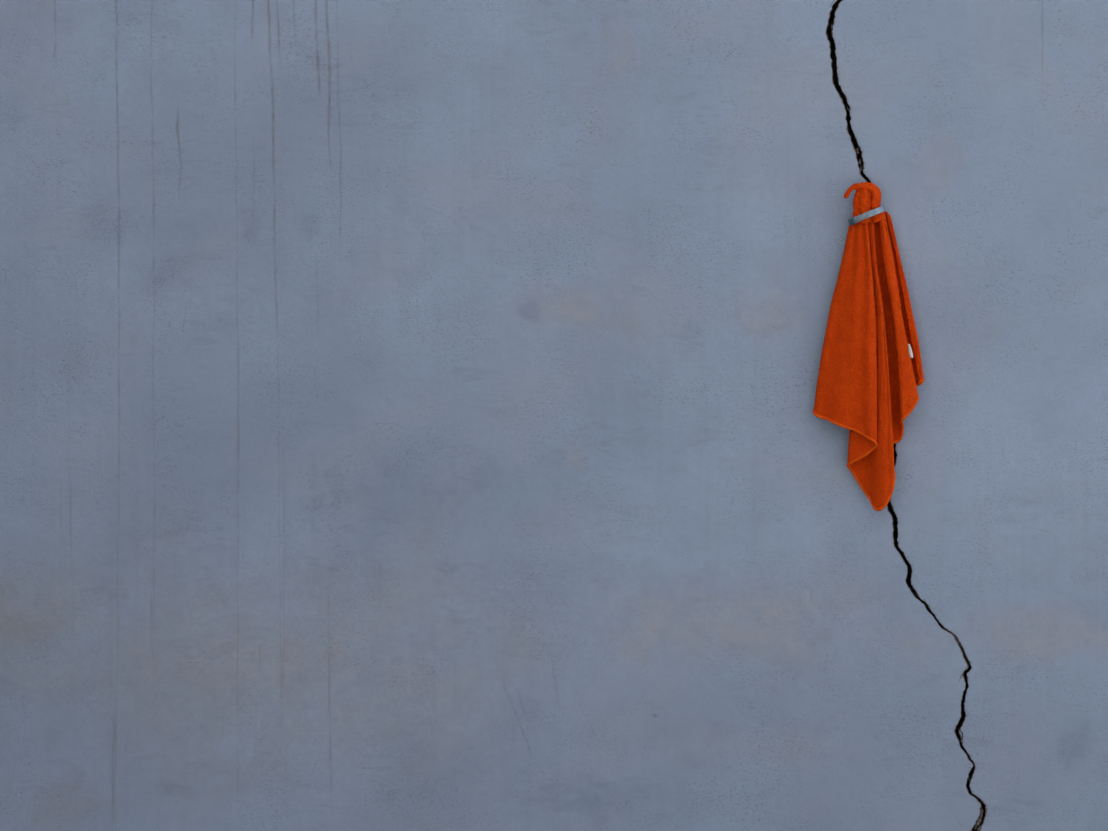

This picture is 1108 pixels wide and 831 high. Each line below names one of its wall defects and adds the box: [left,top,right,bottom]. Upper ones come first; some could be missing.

crack [825,0,871,183]
crack [891,443,899,467]
crack [887,498,987,831]